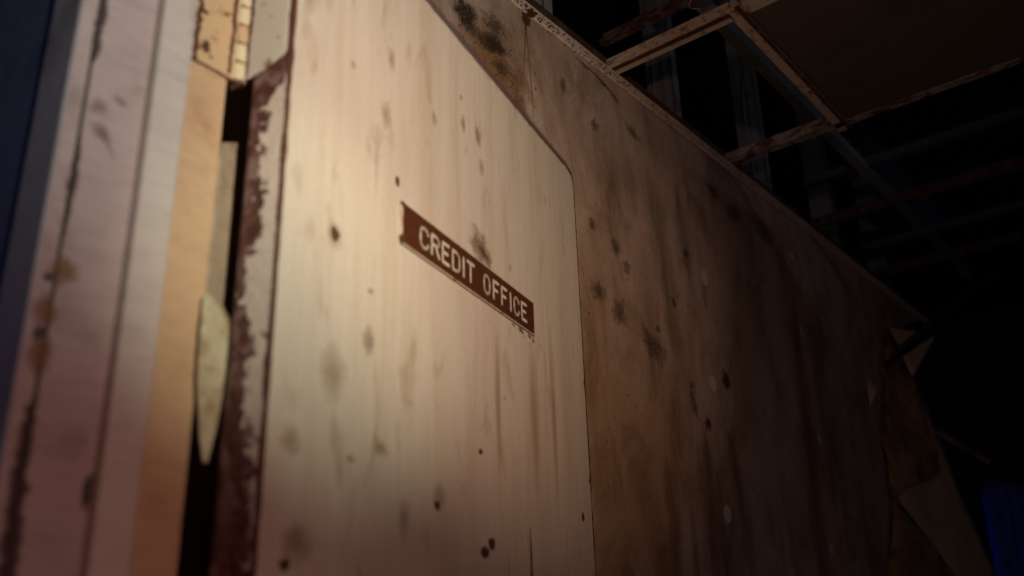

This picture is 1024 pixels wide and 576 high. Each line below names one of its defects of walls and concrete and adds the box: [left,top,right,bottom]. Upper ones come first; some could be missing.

corrosion [191,0,290,576]
mould [455,0,531,101]